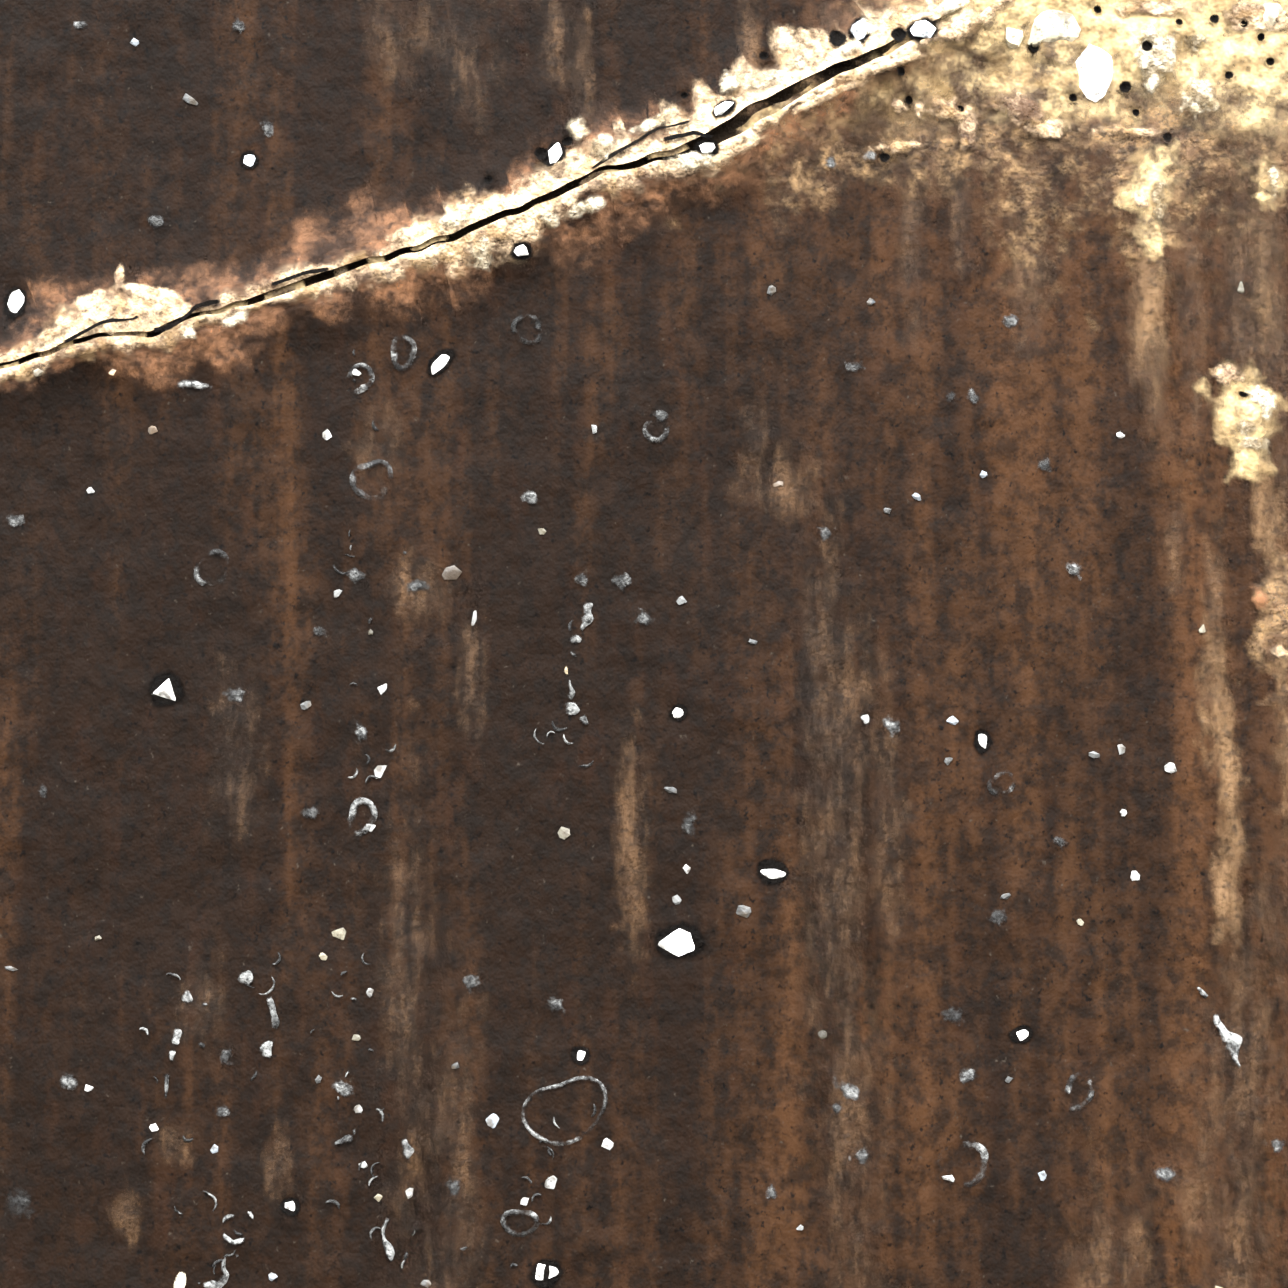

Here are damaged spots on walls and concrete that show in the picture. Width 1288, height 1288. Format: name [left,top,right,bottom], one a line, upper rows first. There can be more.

peeling [848,16,871,44]
crack [0,0,1014,388]
peeling [542,140,565,167]
peeling [695,140,720,156]
peeling [711,99,737,119]
spalling [768,102,846,194]
spalling [863,0,1288,261]
spalling [1197,364,1277,479]